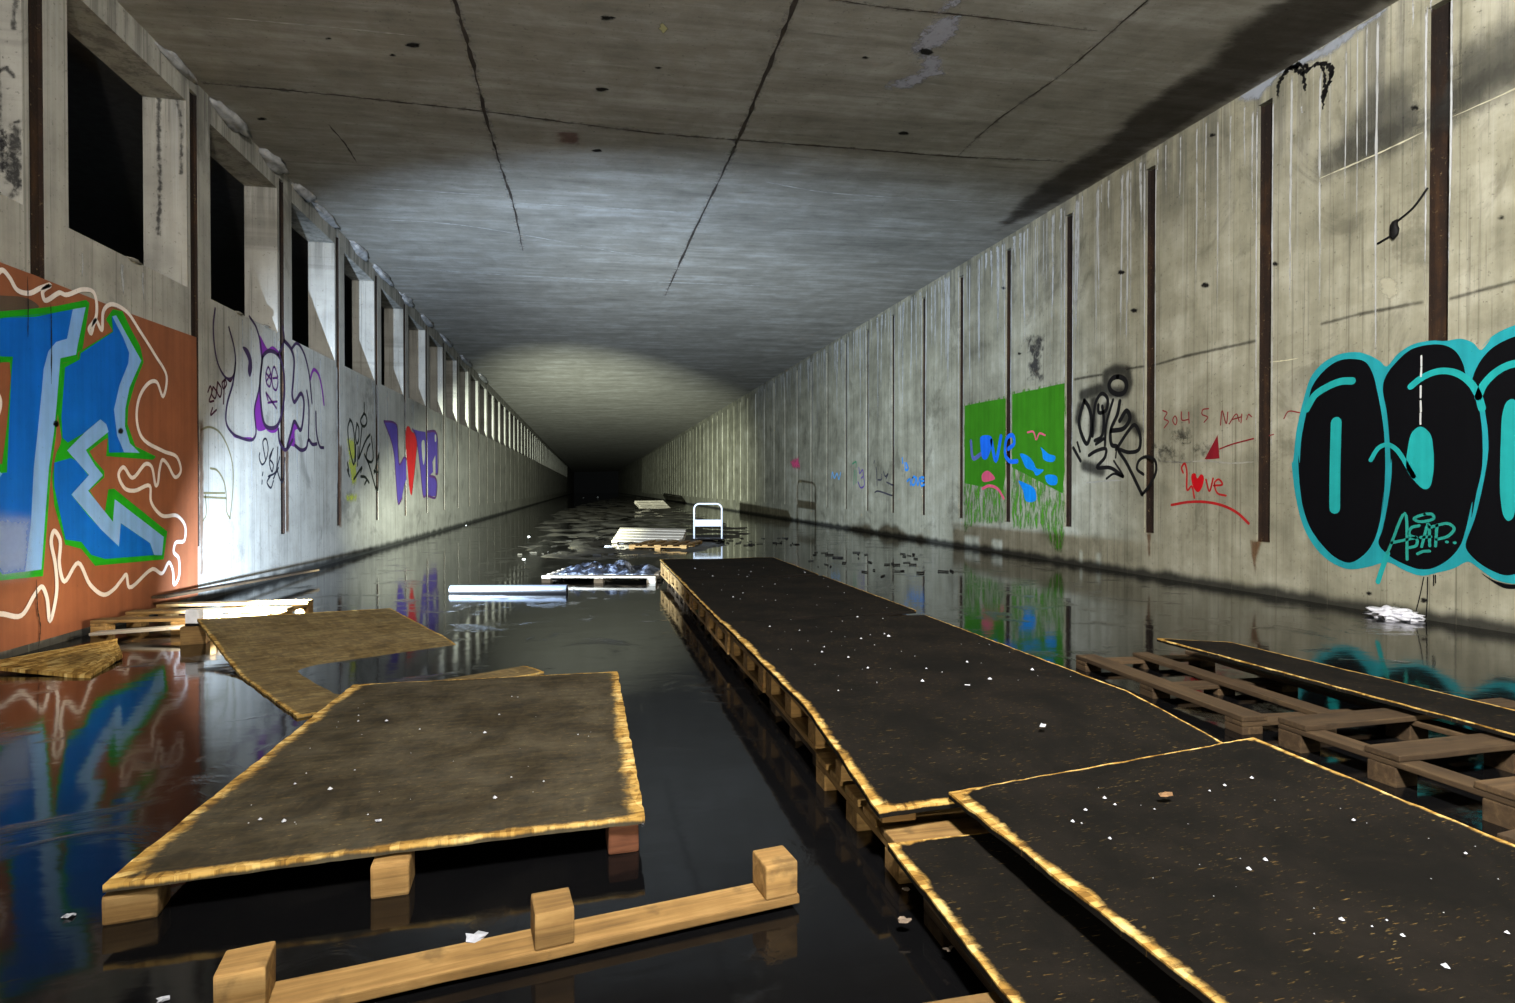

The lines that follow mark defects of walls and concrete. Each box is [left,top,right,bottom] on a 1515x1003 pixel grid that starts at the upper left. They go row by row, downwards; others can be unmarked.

leakage [1,120,22,197]
crack [156,0,1148,295]
leakage [758,0,1389,461]
leakage [1412,0,1432,256]